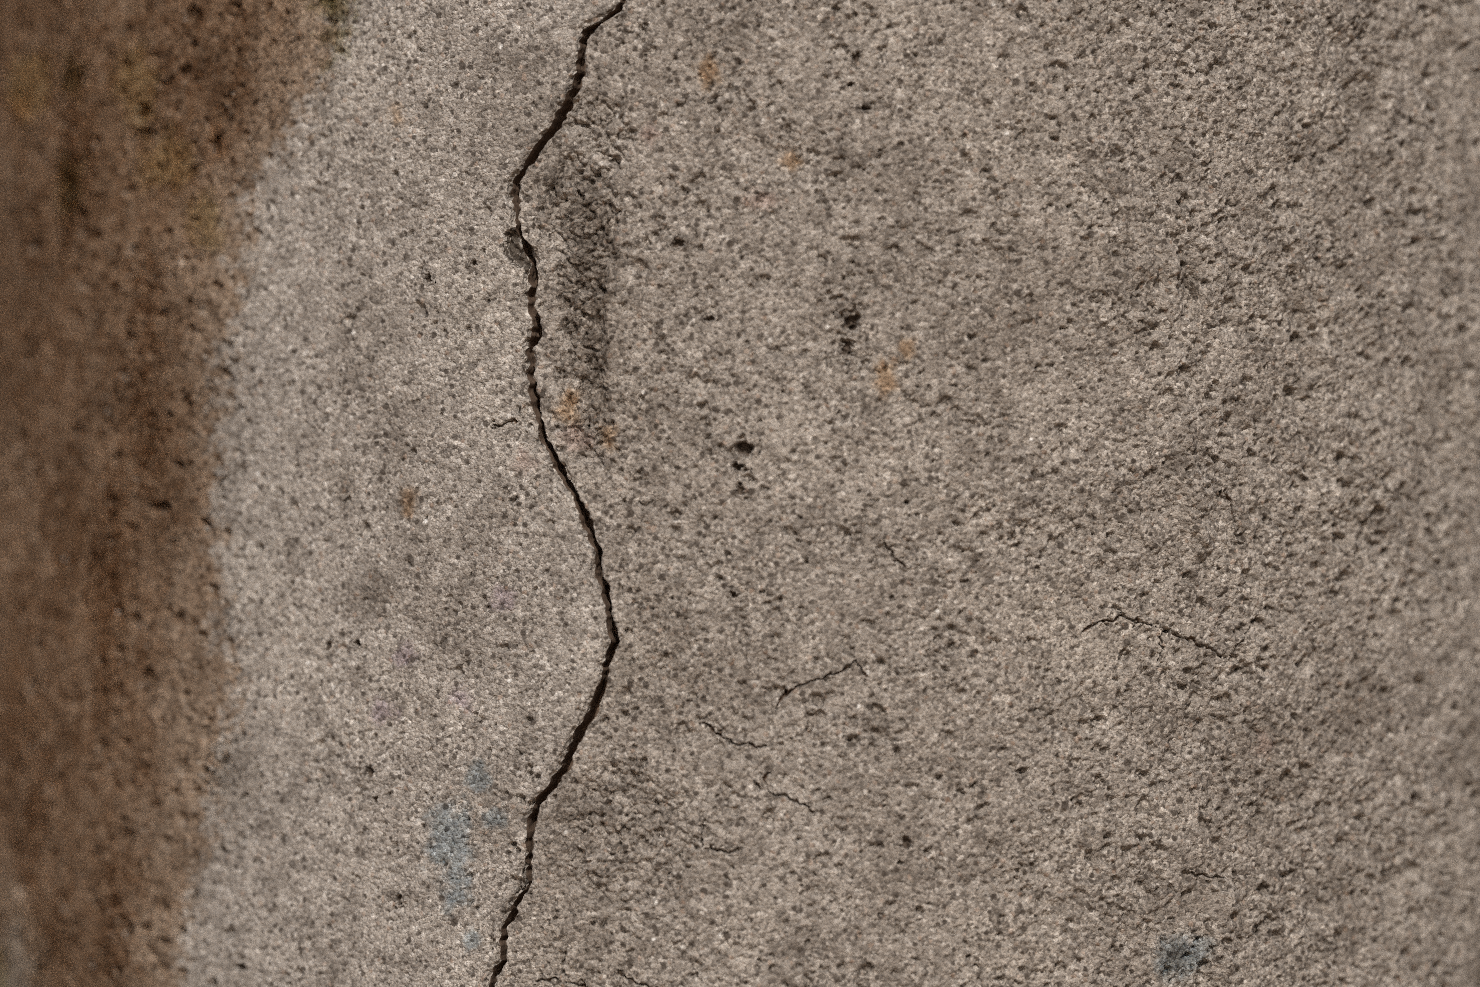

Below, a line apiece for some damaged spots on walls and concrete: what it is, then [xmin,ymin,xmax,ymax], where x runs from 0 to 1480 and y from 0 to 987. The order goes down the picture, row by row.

crack [481,0,664,987]